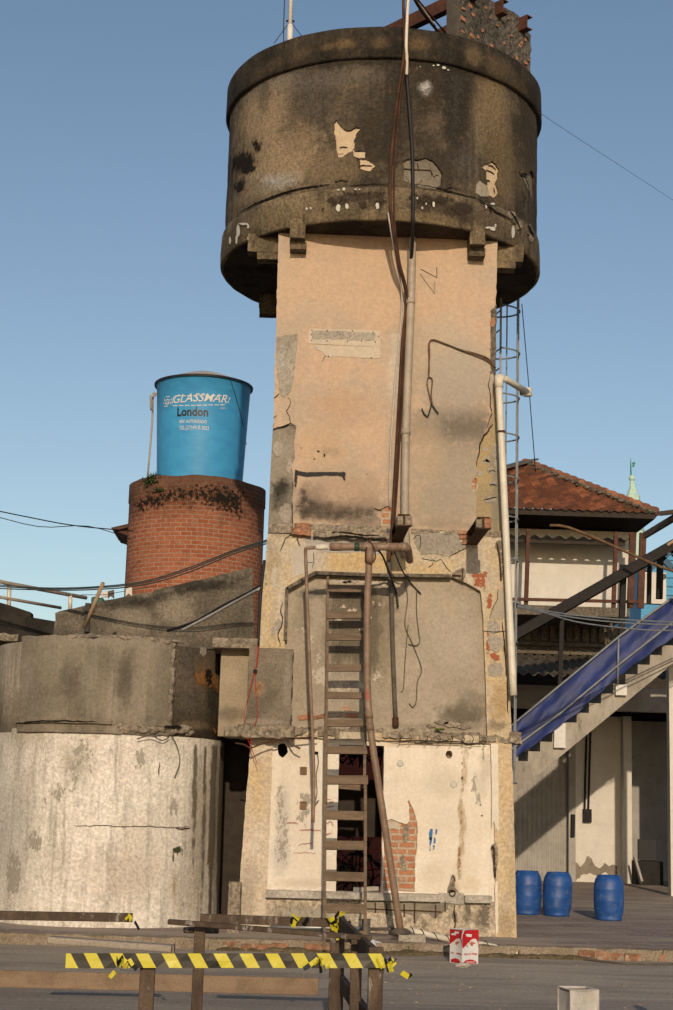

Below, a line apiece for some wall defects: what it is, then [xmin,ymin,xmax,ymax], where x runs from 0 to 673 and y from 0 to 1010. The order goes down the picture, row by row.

damp [232,138,262,192]
spalling [334,121,375,171]
spalling [403,159,475,215]
spalling [476,162,498,197]
peeling [276,334,298,398]
spalling [268,423,392,578]
damp [301,490,369,518]
peeling [472,304,508,711]
peeling [413,531,470,557]
peeling [332,578,388,587]
spalling [452,567,466,582]
flaking render [272,801,459,923]